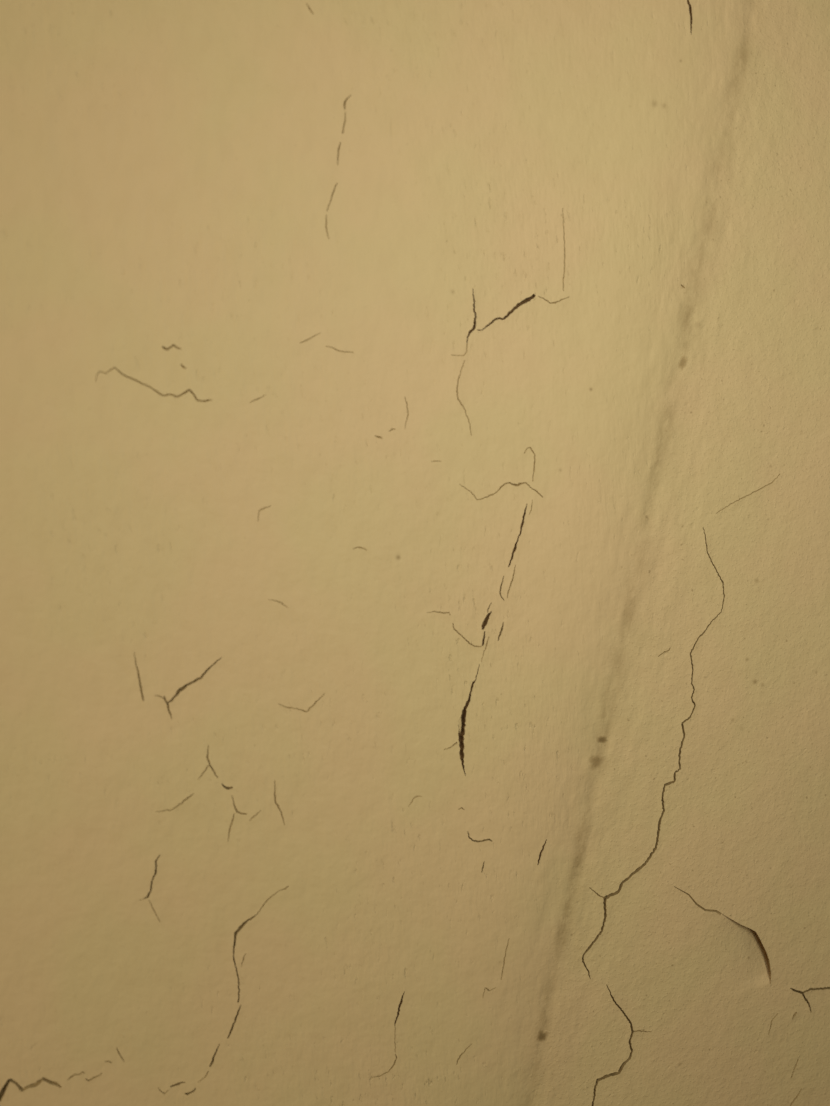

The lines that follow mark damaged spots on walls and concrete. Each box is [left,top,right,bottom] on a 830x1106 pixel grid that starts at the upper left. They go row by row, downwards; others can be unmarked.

crack [685,0,693,34]
crack [454,208,568,436]
crack [96,344,212,402]
crack [427,447,543,776]
crack [134,652,222,719]
crack [582,474,780,1106]
crack [140,855,161,922]
crack [158,886,288,1095]
crack [768,987,830,1035]
crack [0,1049,125,1101]